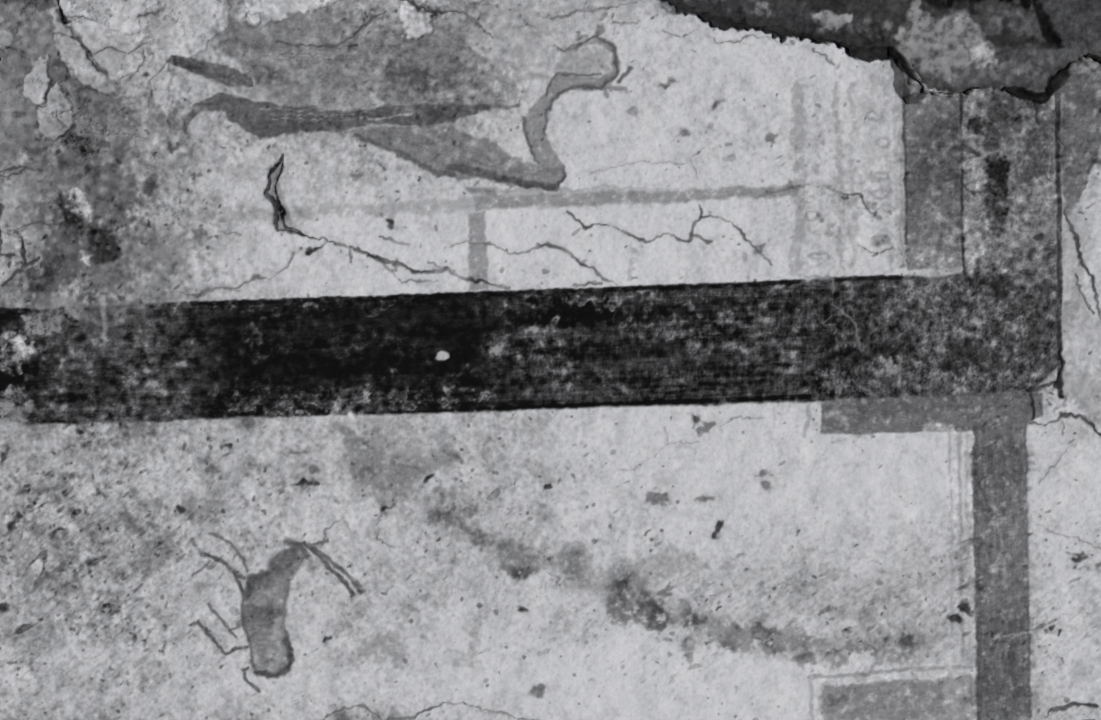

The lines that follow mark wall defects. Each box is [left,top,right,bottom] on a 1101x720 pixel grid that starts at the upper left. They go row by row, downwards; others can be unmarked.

flaking render [0,29,16,51]
crack [37,0,174,139]
flaking render [24,0,231,141]
flaking render [245,0,338,27]
crack [275,0,495,48]
flaking render [401,0,457,39]
crack [538,0,1101,150]
peeling [932,0,1061,91]
crack [0,166,60,288]
crack [172,148,775,299]
crack [1064,209,1101,319]
crack [1014,347,1101,485]